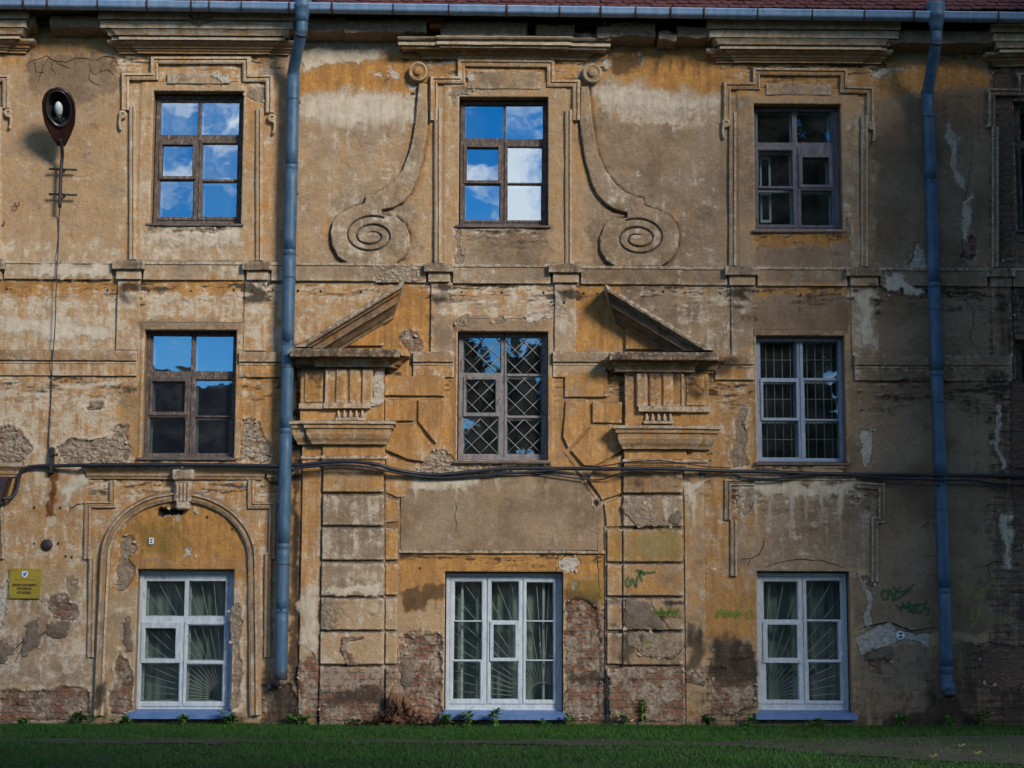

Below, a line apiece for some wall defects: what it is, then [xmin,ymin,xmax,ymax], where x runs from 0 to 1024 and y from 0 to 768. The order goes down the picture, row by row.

crack [26,56,118,87]
spalling [0,424,32,463]
spalling [57,424,131,464]
water stain [989,405,1006,469]
crack [743,538,845,568]
water stain [999,514,1014,569]
spalling [47,576,78,620]
water stain [402,583,445,612]
spalling [559,555,758,723]
water stain [685,624,756,685]
spalling [855,572,934,675]
spalling [0,686,91,722]